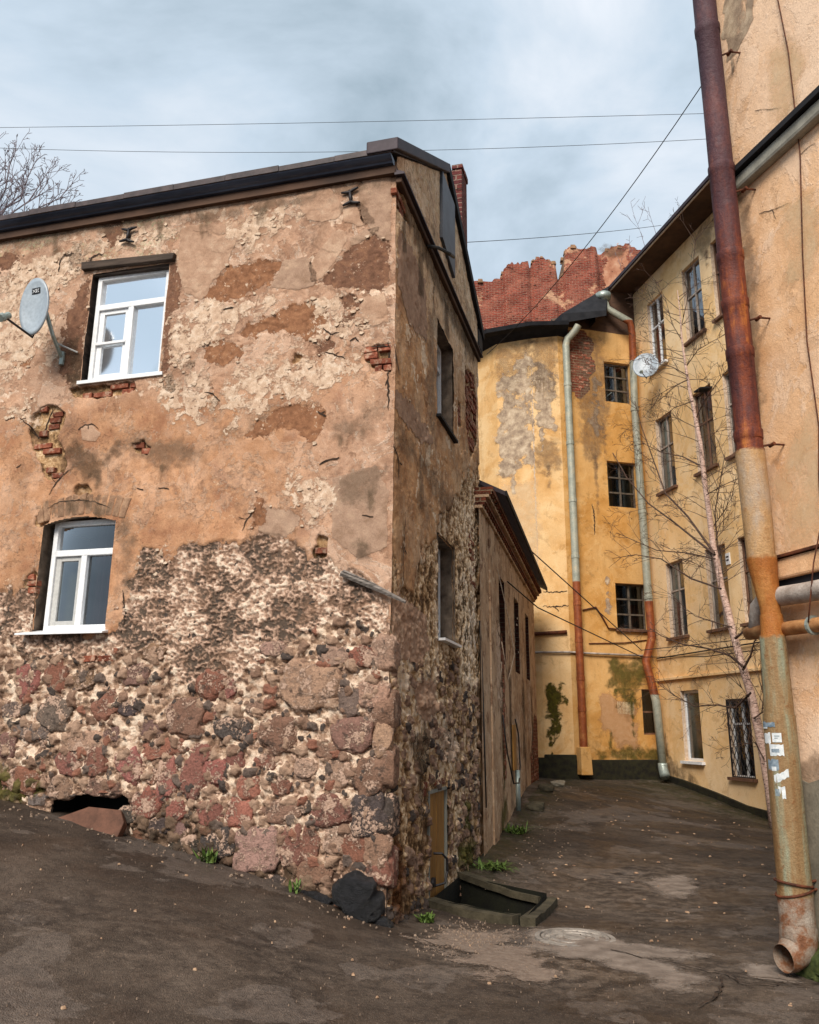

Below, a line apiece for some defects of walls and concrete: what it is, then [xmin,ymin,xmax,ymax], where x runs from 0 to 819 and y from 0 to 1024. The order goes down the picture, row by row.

peeling [0,220,177,480]
peeling [154,193,392,445]
peeling [494,352,558,547]
spalling [562,330,603,437]
spalling [0,370,547,925]
water stain [609,658,645,735]